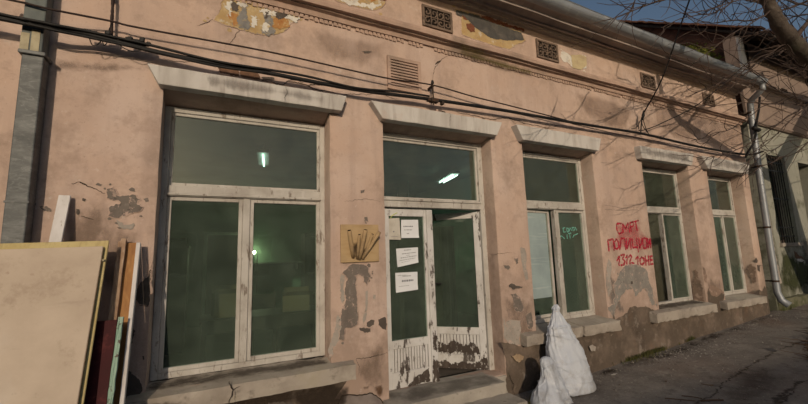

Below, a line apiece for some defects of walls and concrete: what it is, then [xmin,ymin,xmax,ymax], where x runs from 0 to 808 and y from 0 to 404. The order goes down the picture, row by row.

flaking render [203,0,302,36]
flaking render [335,0,387,15]
flaking render [424,5,526,50]
spalling [96,183,149,230]
spalling [136,261,154,307]
flaking render [328,263,388,358]
spalling [508,283,524,313]
flaking render [606,259,657,318]
spalling [126,371,144,398]